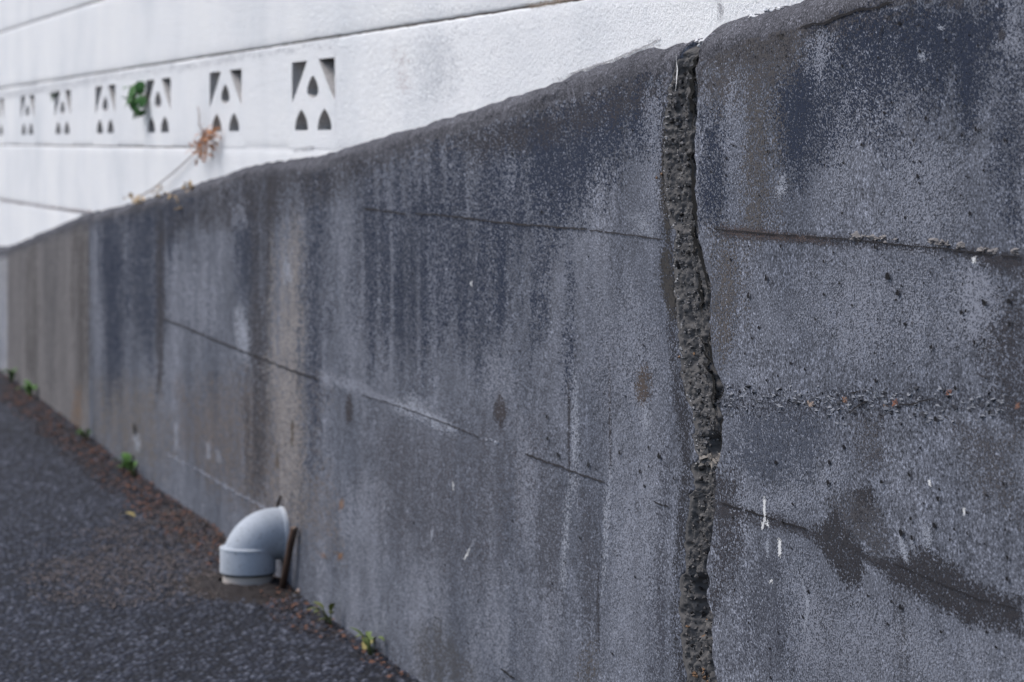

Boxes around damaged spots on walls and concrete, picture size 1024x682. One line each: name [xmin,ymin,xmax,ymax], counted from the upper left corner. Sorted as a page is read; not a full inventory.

leakage [22,72,693,682]
crack [361,46,1021,682]
leakage [707,397,1024,682]